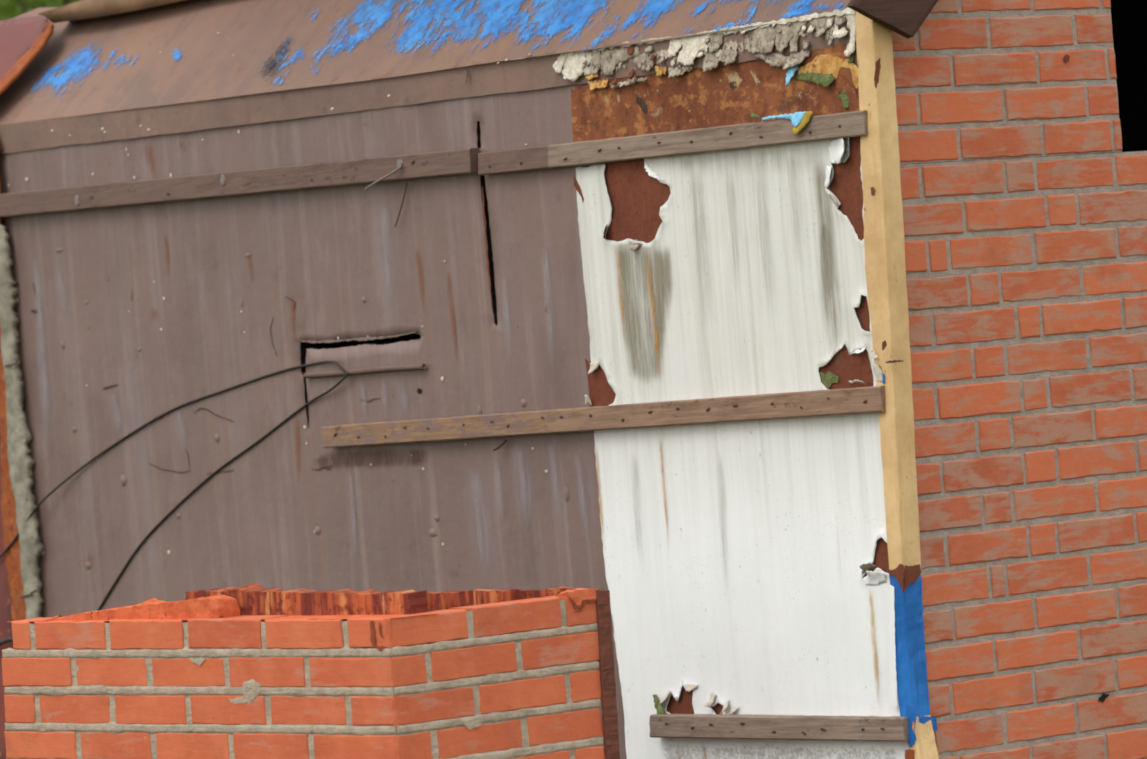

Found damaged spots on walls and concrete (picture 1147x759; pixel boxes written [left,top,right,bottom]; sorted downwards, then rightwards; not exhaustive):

crack [475,121,483,148]
crack [480,175,497,325]
peeling [274,0,858,109]
peeling [603,159,671,251]
rust [570,44,860,142]
peeling [824,136,875,241]
crack [270,296,421,429]
peeling [584,359,616,407]
leakage [619,250,670,375]
peeling [819,296,887,389]
rust [0,327,26,621]
peeling [860,538,938,759]